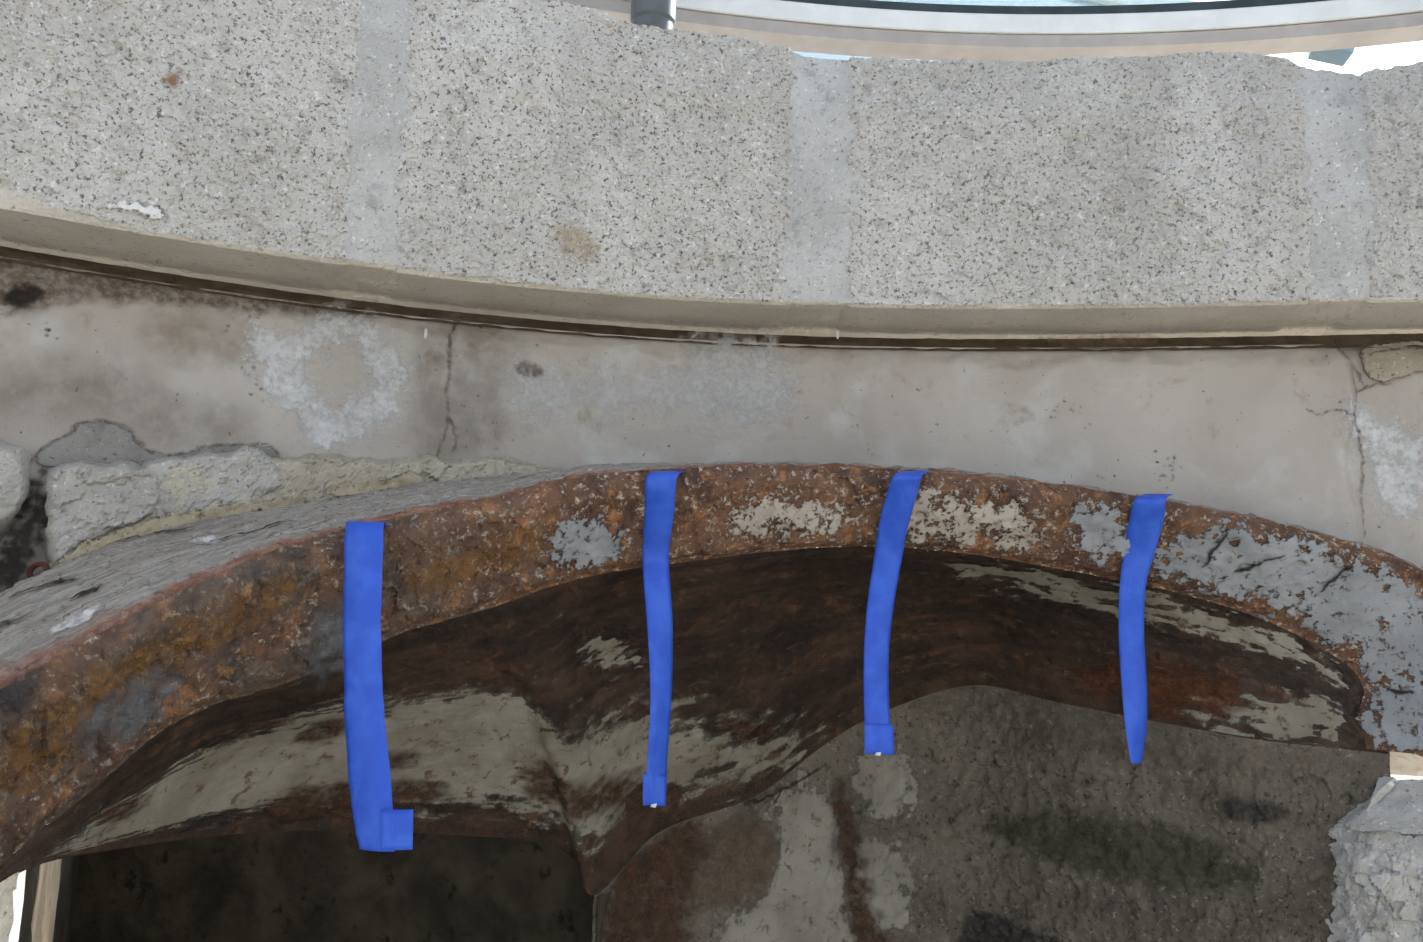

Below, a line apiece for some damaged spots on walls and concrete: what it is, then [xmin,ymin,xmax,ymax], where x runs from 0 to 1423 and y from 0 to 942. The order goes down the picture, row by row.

leakage [247,307,411,450]
spalling [36,420,279,467]
peeling [722,484,860,549]
peeling [907,474,1131,619]
peeling [1144,516,1423,752]
rust [1146,670,1238,714]
rust [299,720,345,741]
rust [271,784,352,820]
rust [389,753,445,802]
rust [518,762,649,819]
leakage [961,913,1057,942]